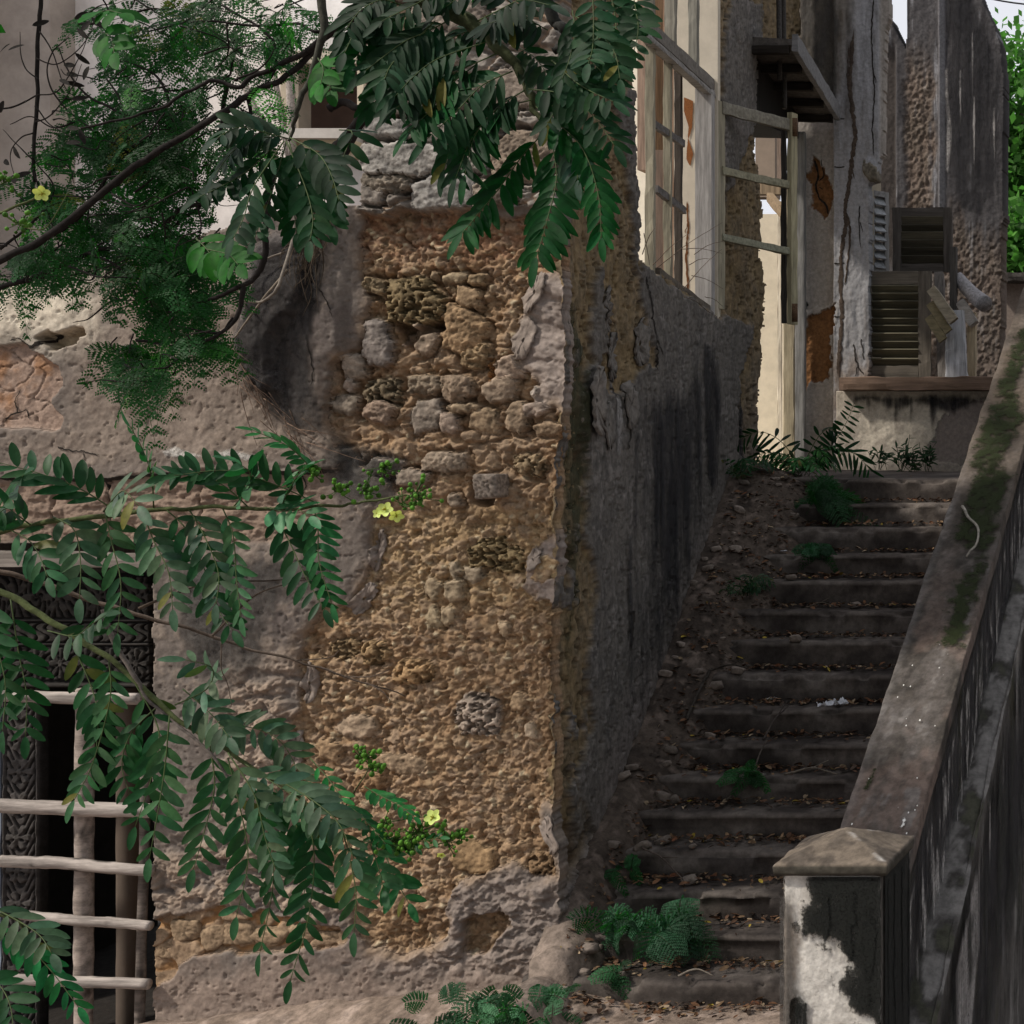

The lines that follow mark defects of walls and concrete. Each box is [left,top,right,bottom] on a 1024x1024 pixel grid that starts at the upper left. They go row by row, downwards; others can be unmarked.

flaking render [684,98,693,165]
flaking render [806,154,834,220]
crack [814,0,876,389]
flaking render [0,328,87,431]
flaking render [806,302,836,386]
water stain [855,396,981,420]
water stain [629,345,720,667]
flaking render [153,204,571,989]
water stain [780,469,1024,1024]